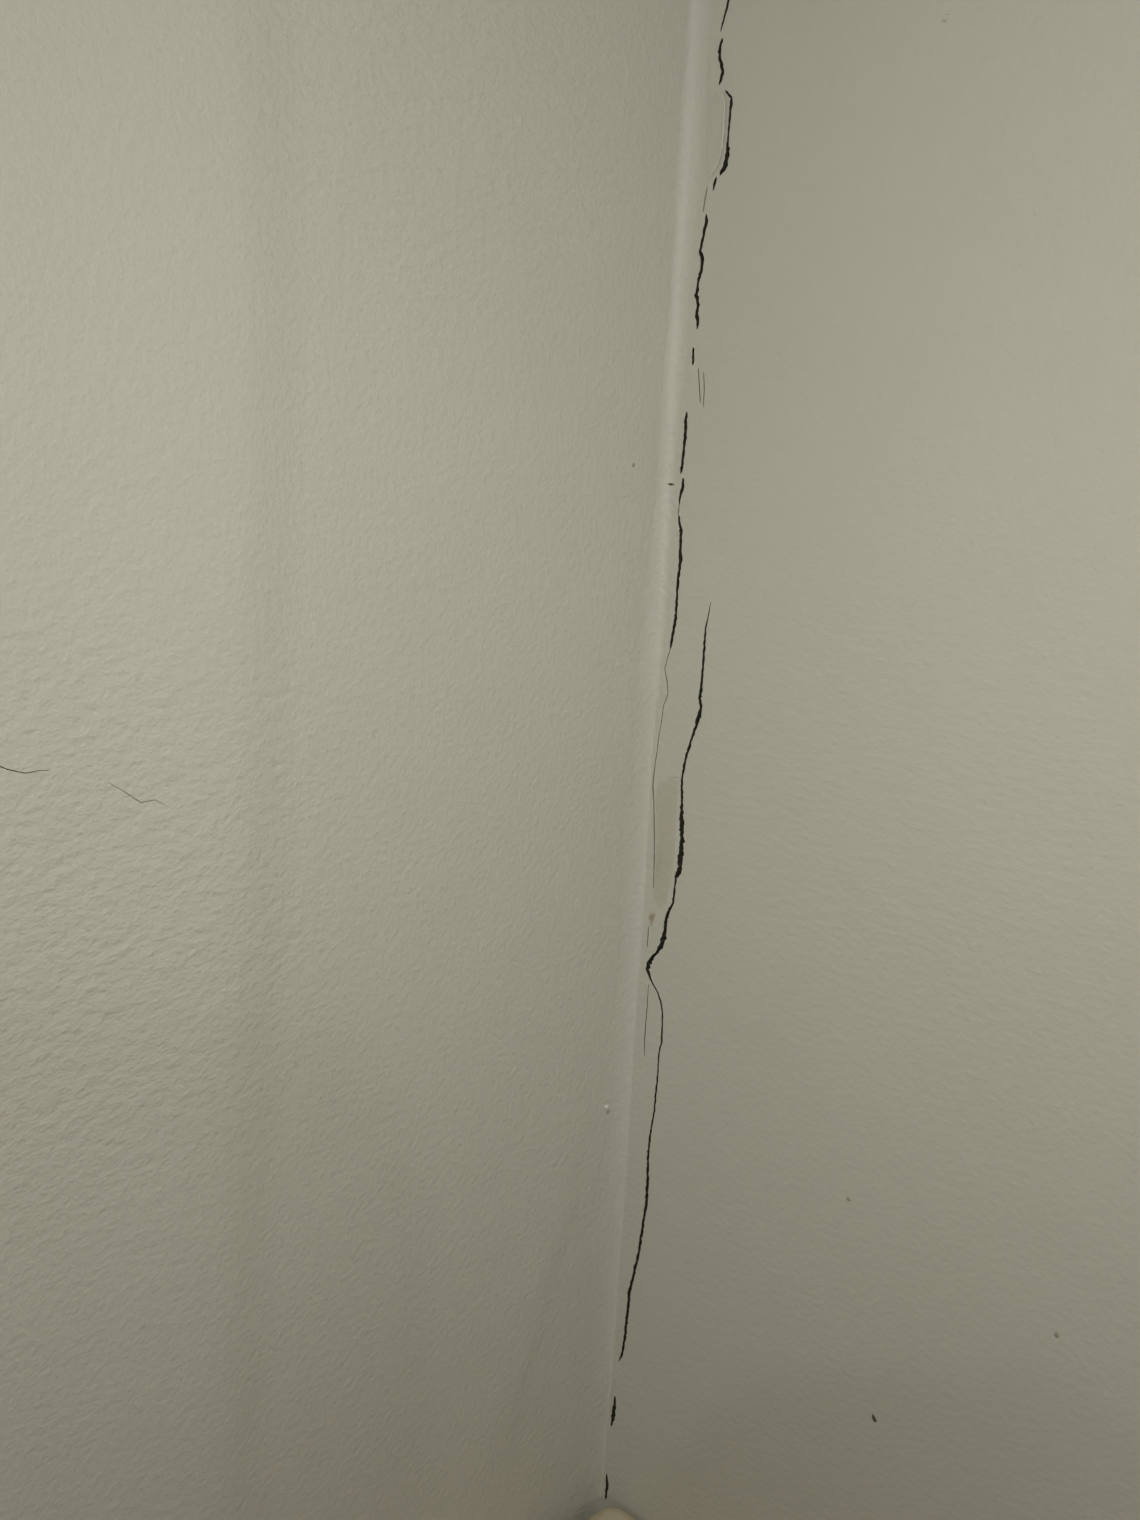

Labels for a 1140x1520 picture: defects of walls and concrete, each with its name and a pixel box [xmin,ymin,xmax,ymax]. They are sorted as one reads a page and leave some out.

crack [619,0,733,1361]
crack [609,1397,617,1426]
crack [603,1473,611,1499]